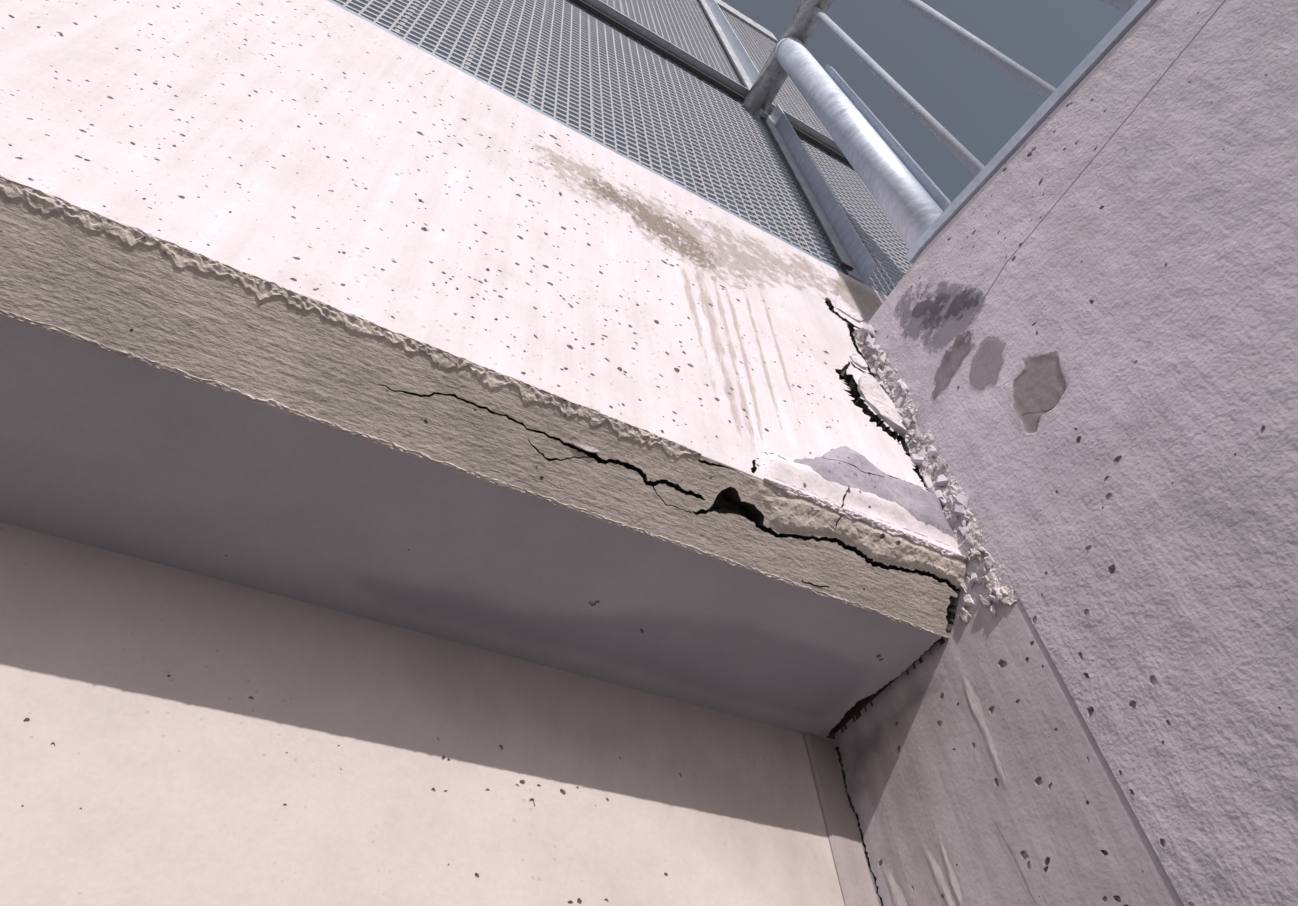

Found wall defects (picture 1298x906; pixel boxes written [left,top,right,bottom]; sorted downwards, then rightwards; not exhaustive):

crack [378,297,961,906]
spalling [710,281,1019,624]
peeling [1012,355,1066,434]